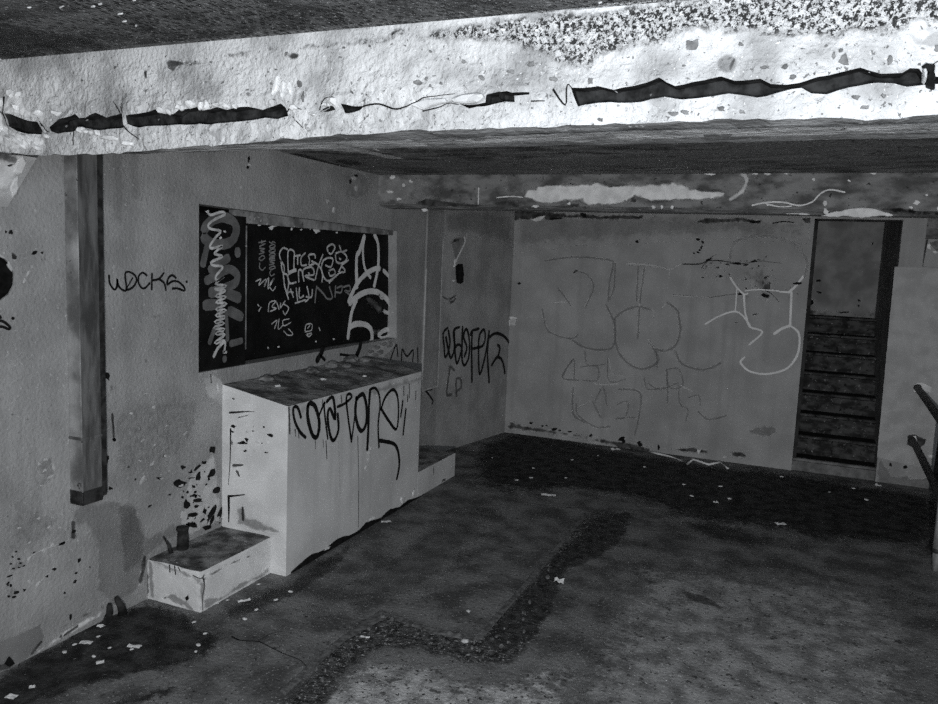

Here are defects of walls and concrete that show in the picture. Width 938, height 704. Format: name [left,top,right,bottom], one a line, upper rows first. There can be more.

crack [0,61,938,145]
peeling [515,183,724,221]